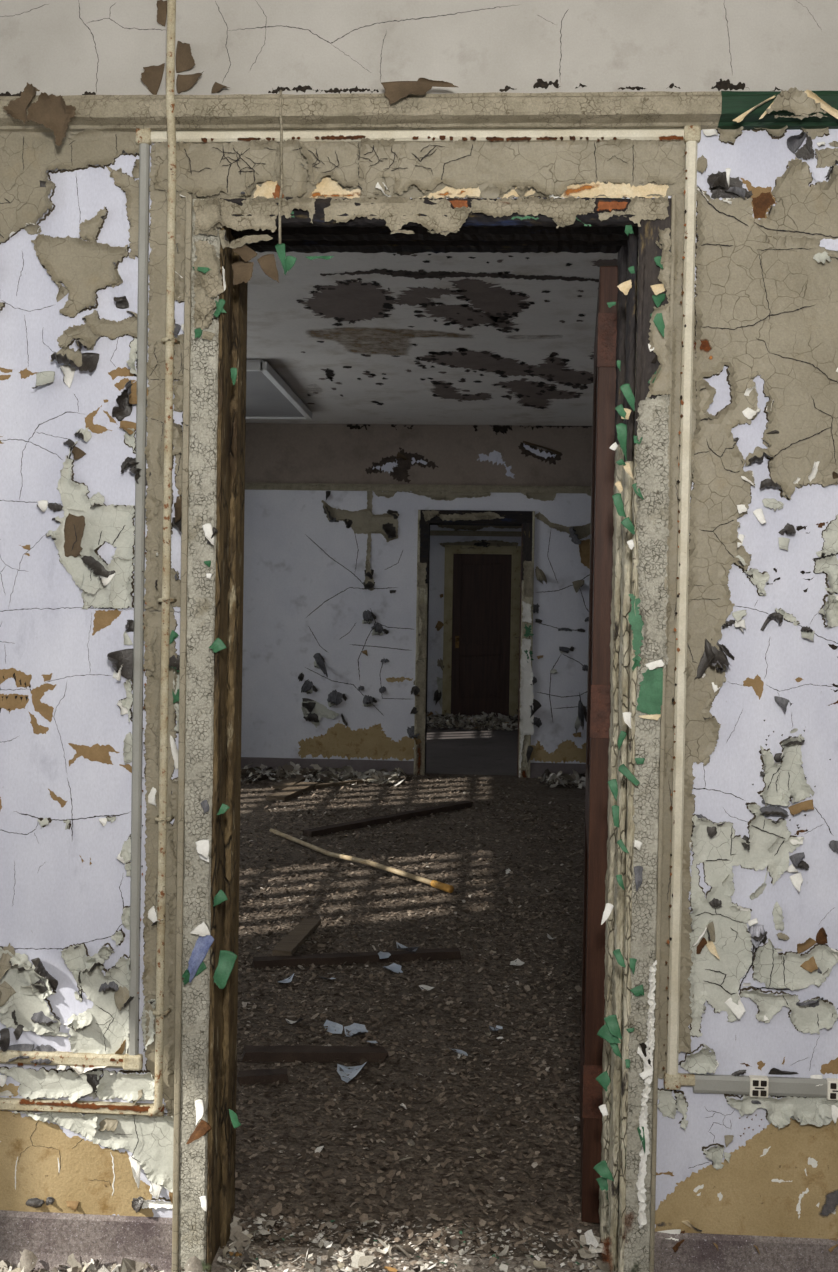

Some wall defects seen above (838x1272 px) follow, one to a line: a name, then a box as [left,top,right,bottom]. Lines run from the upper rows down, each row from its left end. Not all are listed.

crack [78,0,161,93]
crack [215,1,568,83]
peeling [533,79,560,89]
peeling [711,79,750,91]
crack [184,142,473,193]
crack [0,234,57,361]
crack [696,186,838,463]
crack [0,394,177,906]
spalling [0,82,237,1217]
crack [305,535,414,716]
peeling [175,87,838,1252]
crack [1,878,124,950]